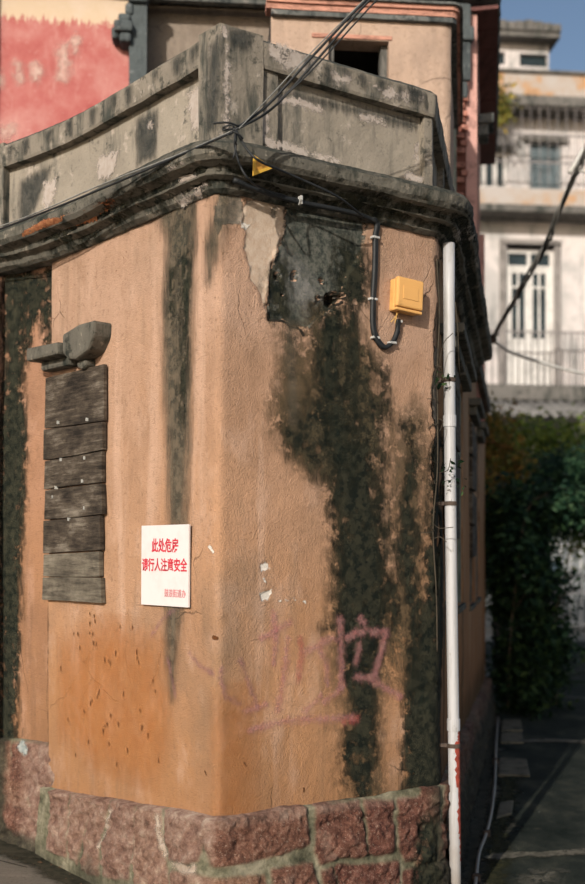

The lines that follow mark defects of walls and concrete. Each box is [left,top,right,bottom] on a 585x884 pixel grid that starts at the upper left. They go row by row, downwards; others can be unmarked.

peeling [16,62,43,83]
peeling [57,36,81,82]
leakage [186,25,251,131]
leakage [398,87,429,109]
leakage [136,114,156,161]
leakage [97,151,118,180]
leakage [20,170,56,220]
flaking render [207,194,372,336]
leakage [163,215,193,525]
leakage [279,304,445,798]
leakage [167,606,180,683]